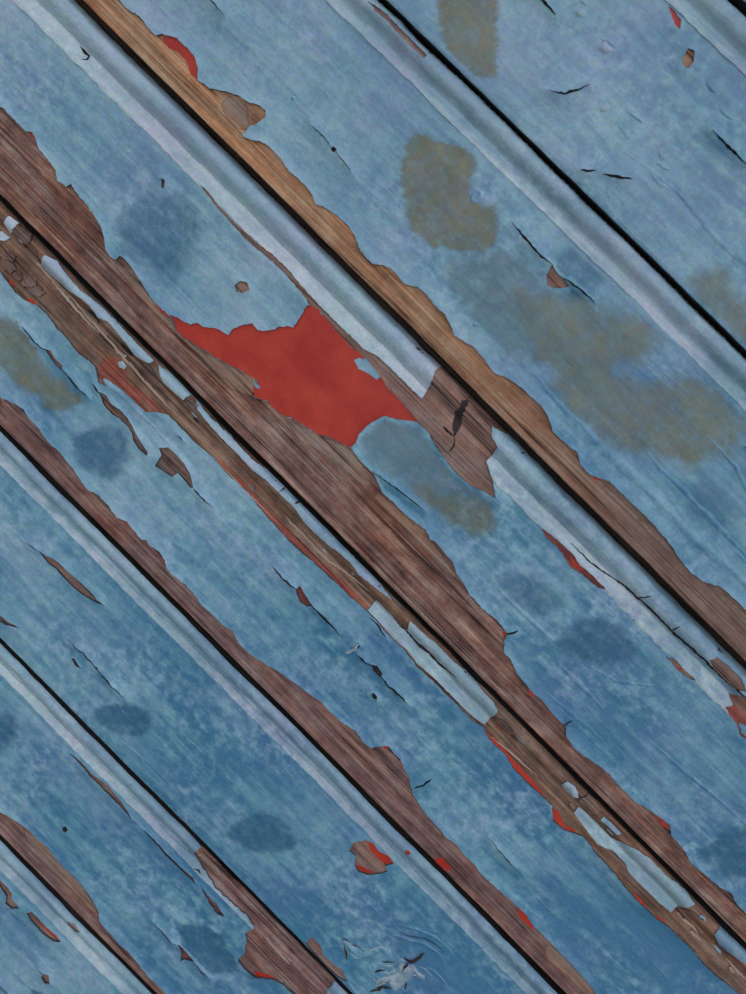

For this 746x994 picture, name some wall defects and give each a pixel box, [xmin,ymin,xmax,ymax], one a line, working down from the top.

peeling [0,201,746,994]
peeling [84,0,746,661]
water stain [402,136,495,250]
water stain [440,0,497,75]